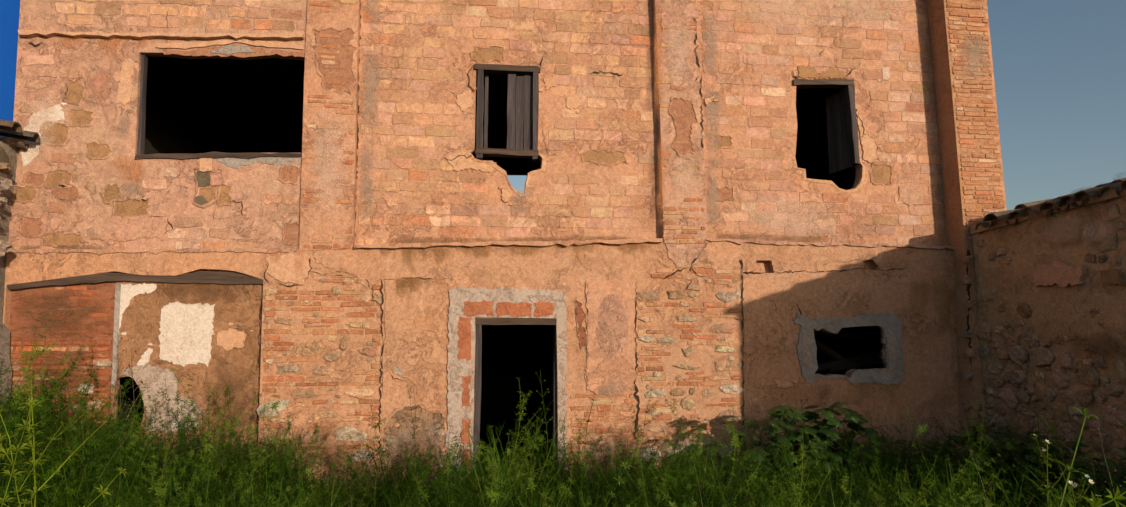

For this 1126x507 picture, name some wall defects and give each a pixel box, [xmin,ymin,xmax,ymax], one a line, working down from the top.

crack [693,17,704,148]
peeling [444,150,547,206]
peeling [114,283,157,347]
peeling [120,301,253,438]
crack [963,246,975,399]